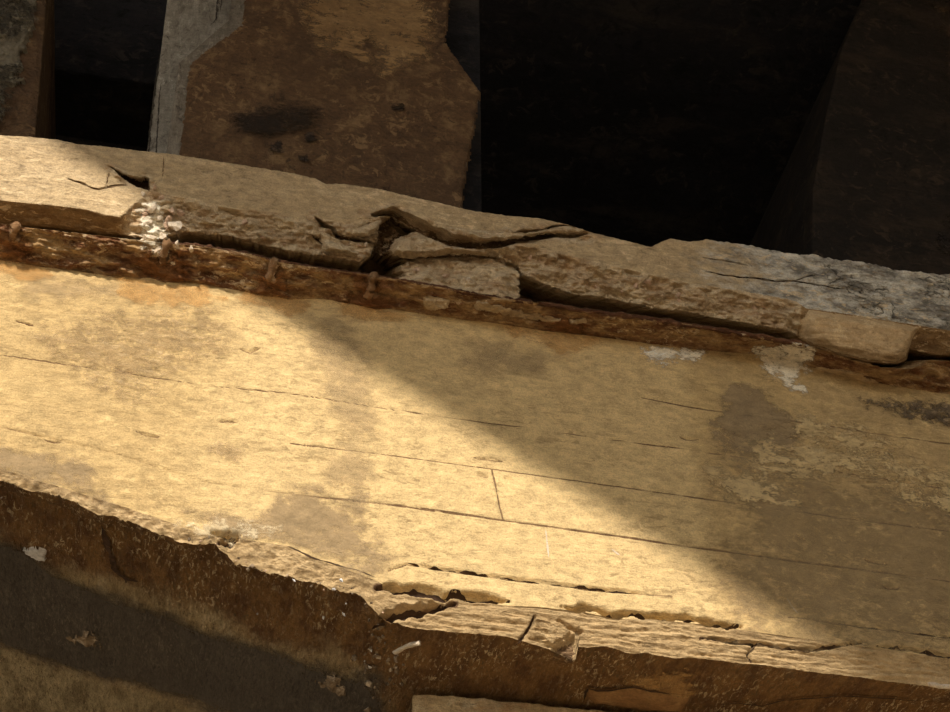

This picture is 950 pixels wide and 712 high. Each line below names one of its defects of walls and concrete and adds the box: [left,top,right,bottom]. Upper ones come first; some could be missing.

crack [72,85,164,191]
corrosion [0,236,32,264]
corrosion [137,252,189,283]
crack [312,223,374,245]
corrosion [345,278,391,309]
crack [377,214,574,267]
peeling [172,218,807,348]
corrosion [541,315,588,335]
peeling [703,414,895,508]
leakage [709,383,950,647]
peeling [527,618,575,660]
peeling [587,687,689,712]